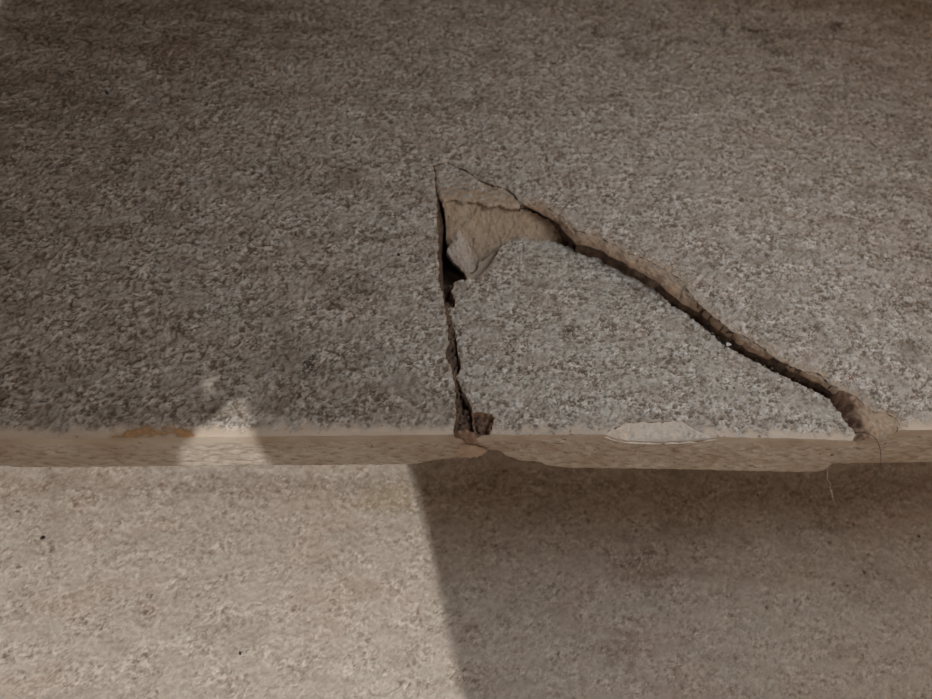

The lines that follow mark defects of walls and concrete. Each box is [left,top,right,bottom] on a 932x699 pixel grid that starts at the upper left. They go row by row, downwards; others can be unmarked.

crack [421,162,518,445]
spalling [434,163,899,472]
crack [564,231,843,407]